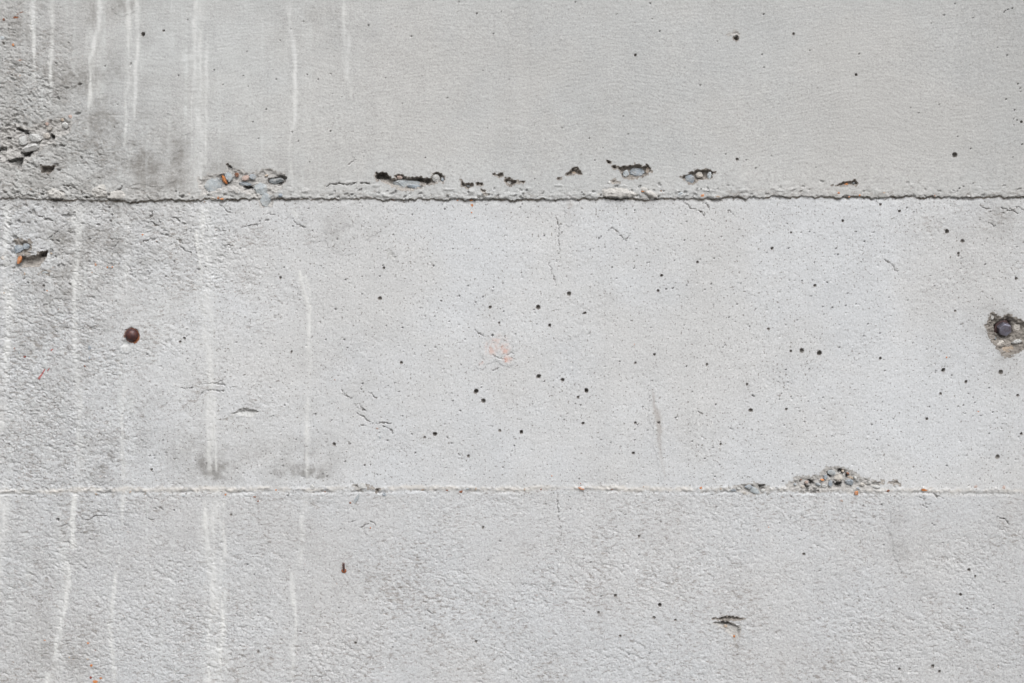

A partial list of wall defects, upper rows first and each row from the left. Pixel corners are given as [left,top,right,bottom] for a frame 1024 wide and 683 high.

leakage [282,0,302,191]
spalling [0,115,73,174]
spalling [197,162,287,208]
spalling [374,171,445,191]
spalling [606,160,653,184]
spalling [679,168,717,185]
leakage [0,202,23,435]
leakage [26,0,244,683]
spalling [984,312,1024,359]
leakage [259,268,343,683]
spalling [785,466,901,502]